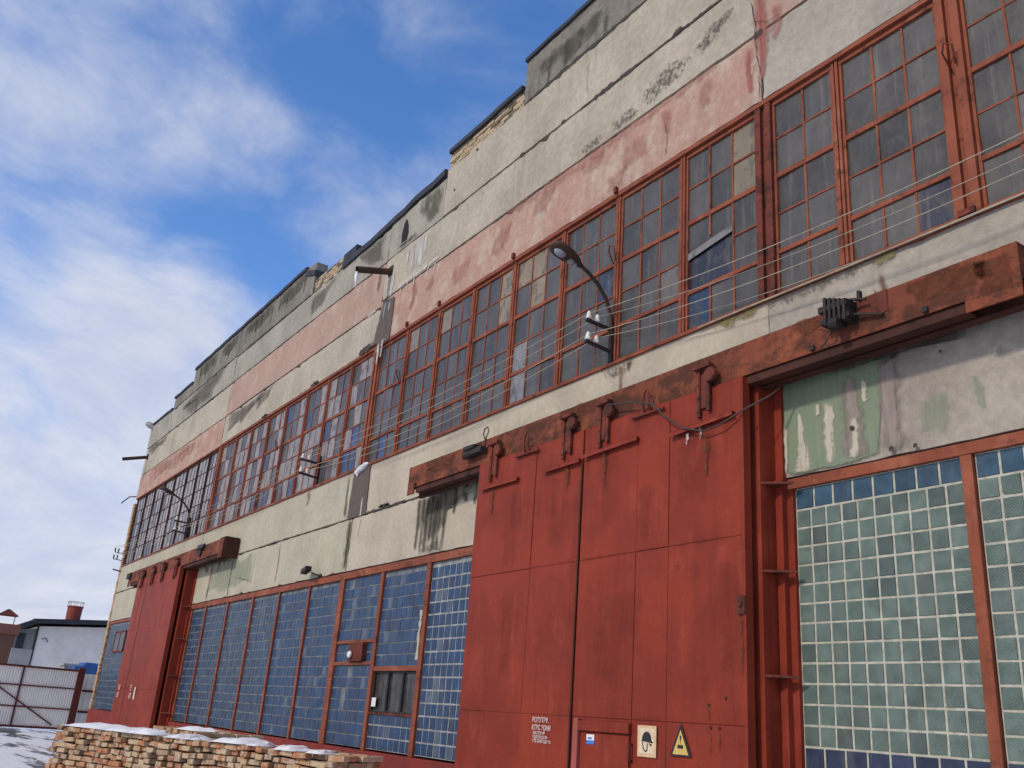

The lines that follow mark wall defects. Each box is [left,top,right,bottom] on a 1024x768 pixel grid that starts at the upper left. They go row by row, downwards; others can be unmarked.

crack [751,4,775,92]
corrosion [907,254,1012,302]
corrosion [794,317,823,334]
corrosion [572,400,597,418]
peeling [783,355,917,474]
corrosion [426,453,455,471]
water stain [414,482,477,553]